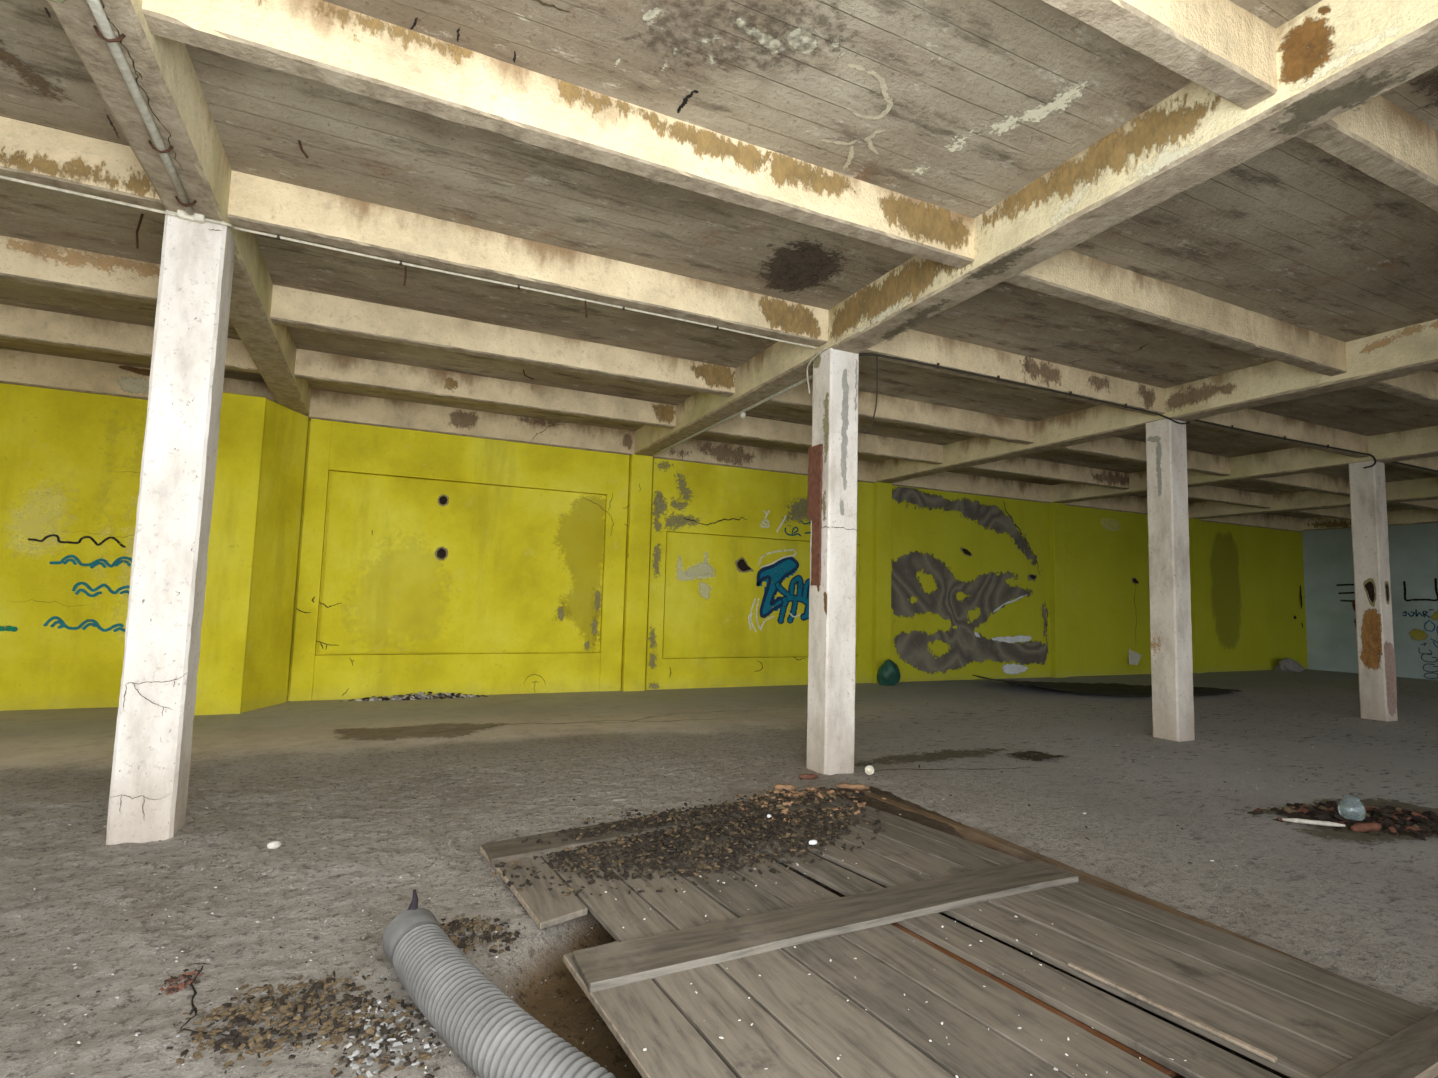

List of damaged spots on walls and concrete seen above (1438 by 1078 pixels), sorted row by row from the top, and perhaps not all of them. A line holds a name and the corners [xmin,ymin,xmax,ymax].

rust [1278,5,1336,84]
damp [1270,15,1438,135]
damp [983,94,1221,229]
damp [757,237,1035,345]
rust [807,444,827,615]
rust [1360,608,1382,670]